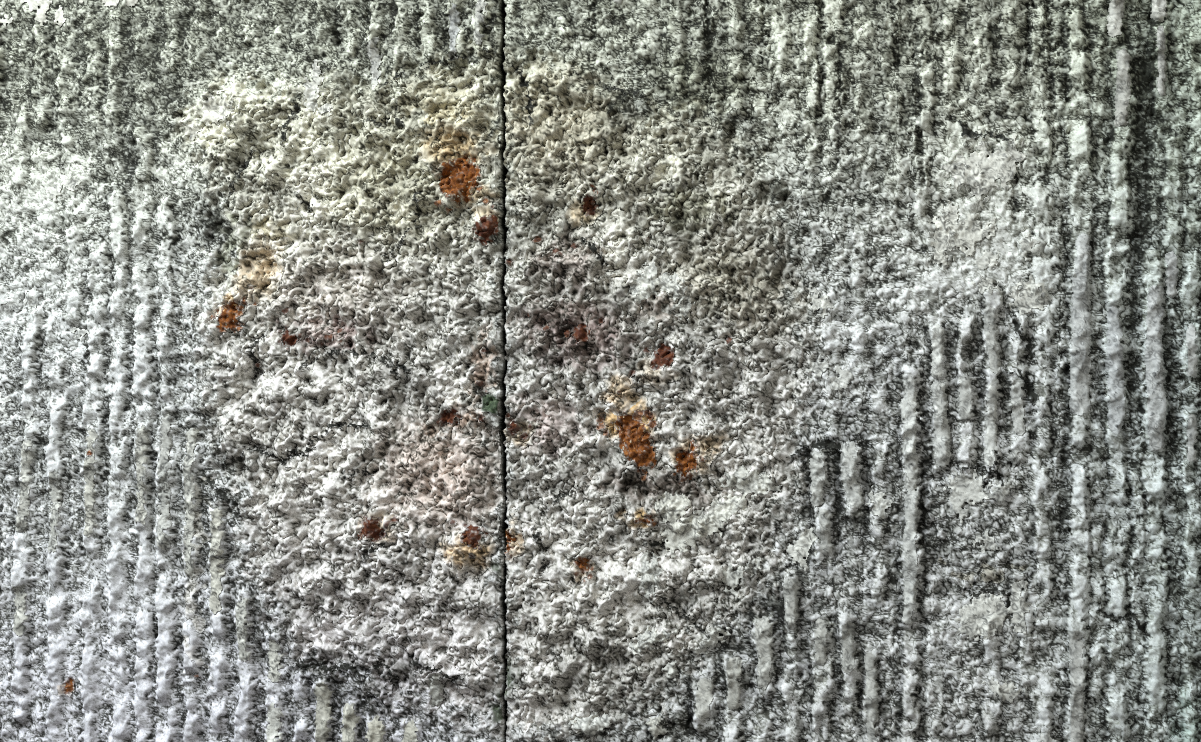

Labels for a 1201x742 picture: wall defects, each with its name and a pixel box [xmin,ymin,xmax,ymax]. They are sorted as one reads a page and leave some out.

rust [415,116,501,246]
rust [531,183,602,257]
rust [209,229,345,350]
rust [542,317,604,348]
rust [592,343,738,484]
rust [356,507,404,544]
rust [436,513,525,580]